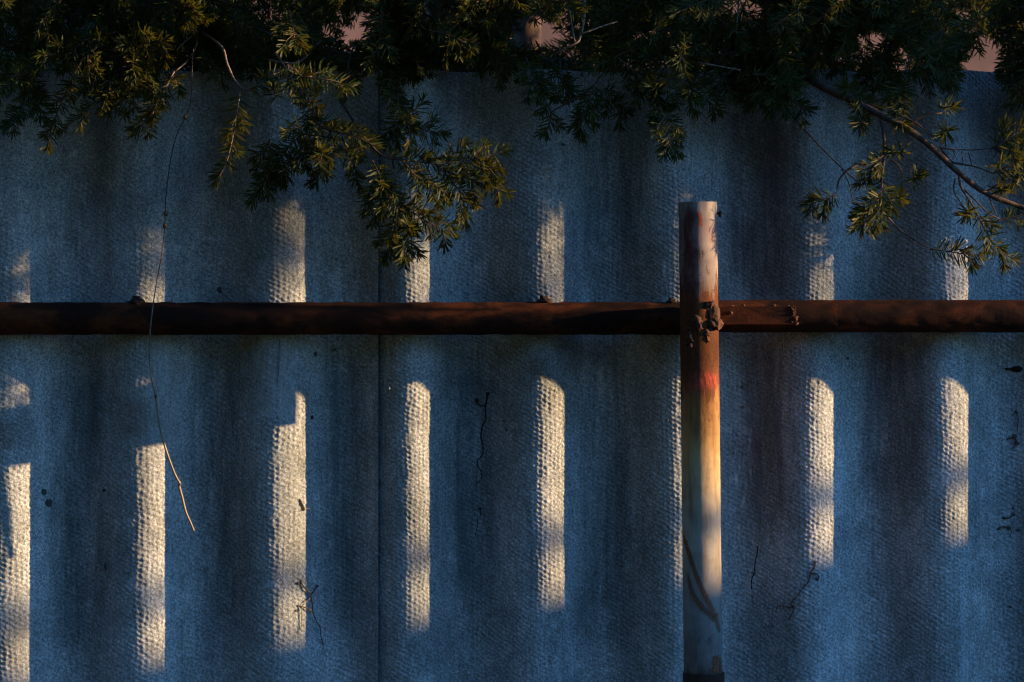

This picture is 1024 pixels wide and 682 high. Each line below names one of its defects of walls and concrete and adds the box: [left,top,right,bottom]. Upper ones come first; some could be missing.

crack [475,392,489,535]